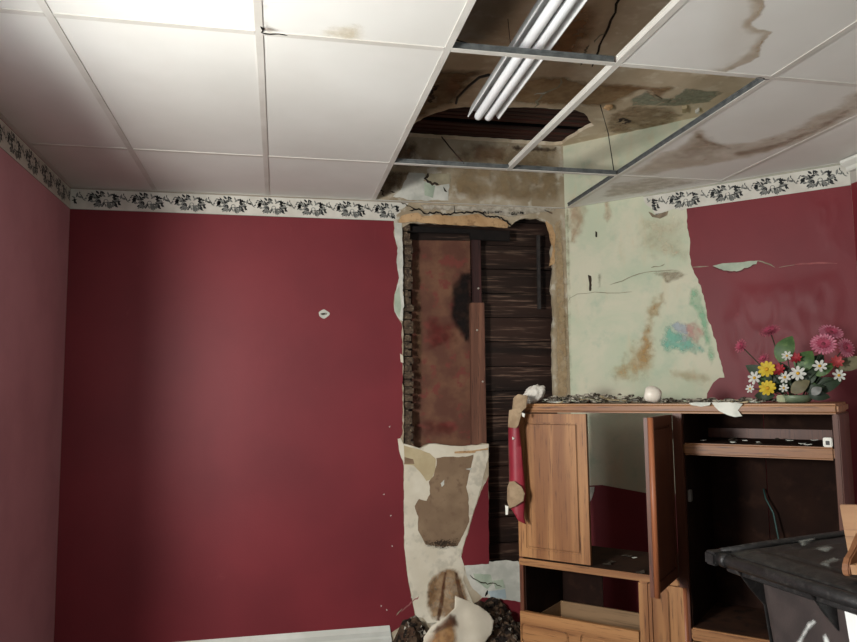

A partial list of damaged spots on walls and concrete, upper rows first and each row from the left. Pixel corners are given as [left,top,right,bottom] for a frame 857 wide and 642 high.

crack [580,0,620,67]
peeling [380,173,450,201]
crack [402,203,511,226]
peeling [664,313,708,350]
flaking render [465,560,520,602]